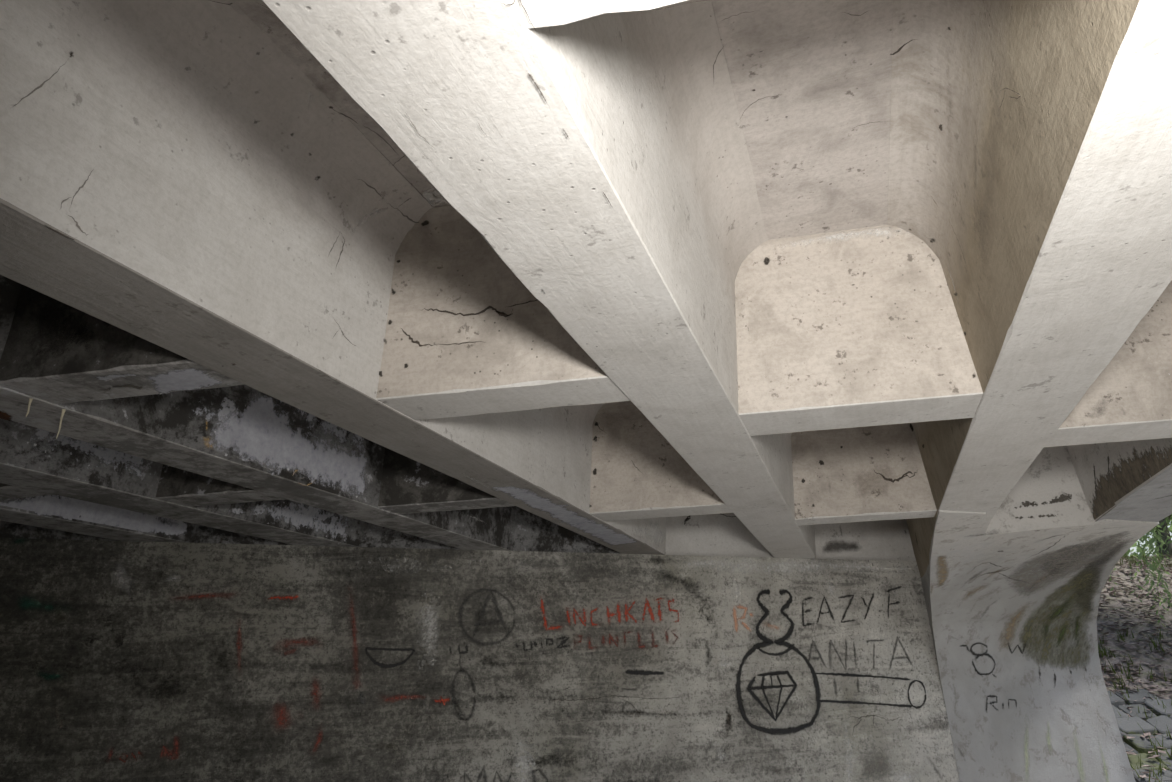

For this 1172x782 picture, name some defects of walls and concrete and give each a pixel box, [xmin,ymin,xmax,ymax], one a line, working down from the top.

crack [401,299,538,346]
crack [875,471,932,492]
damp [1013,528,1123,644]